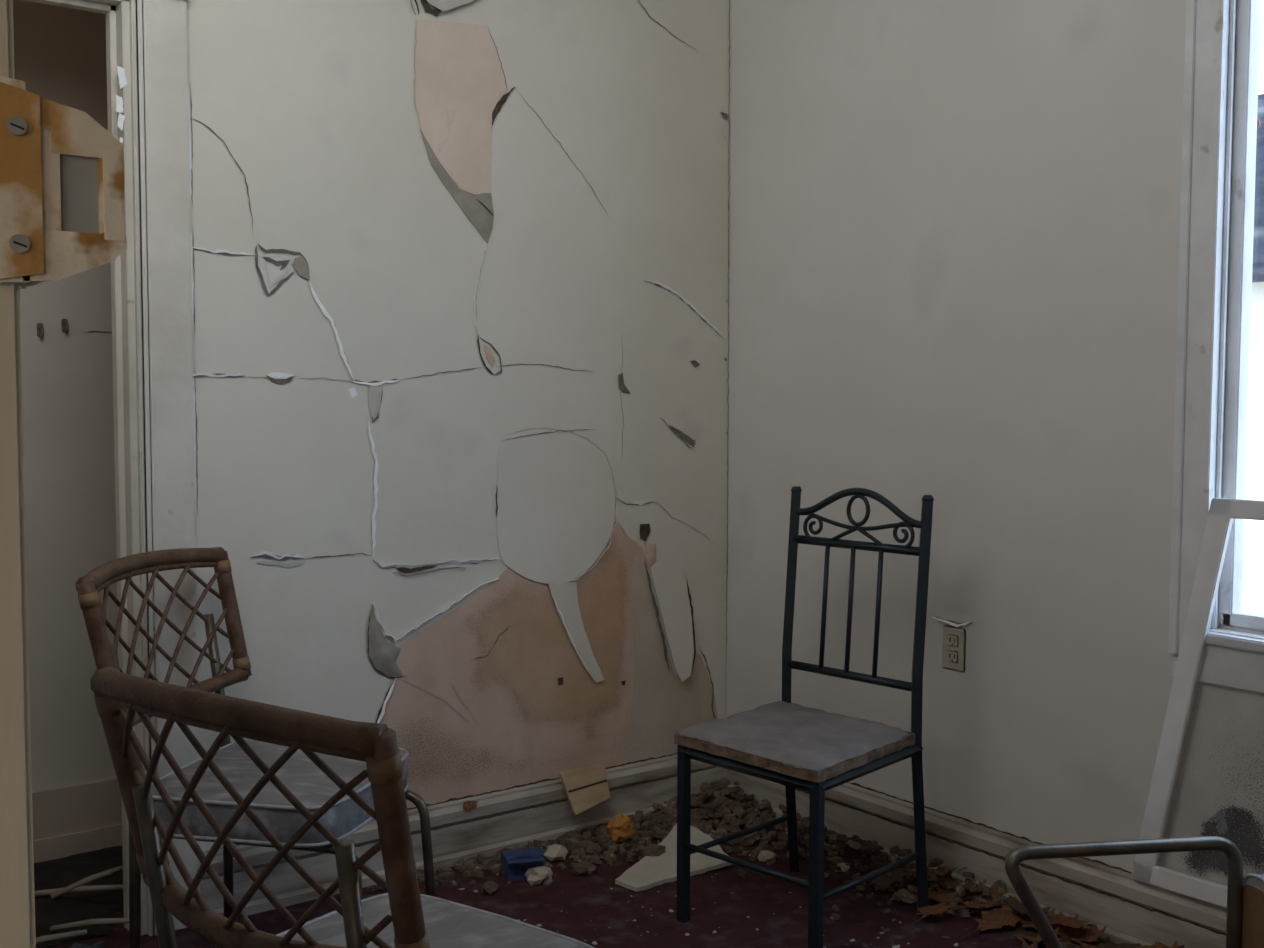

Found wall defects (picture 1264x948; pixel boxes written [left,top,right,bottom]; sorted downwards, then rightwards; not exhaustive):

crack [188,82,256,337]
peeling [410,0,515,244]
crack [193,373,246,509]
crack [251,280,631,577]
crack [616,0,730,714]
peeling [367,518,718,808]
water stain [1178,707,1264,879]